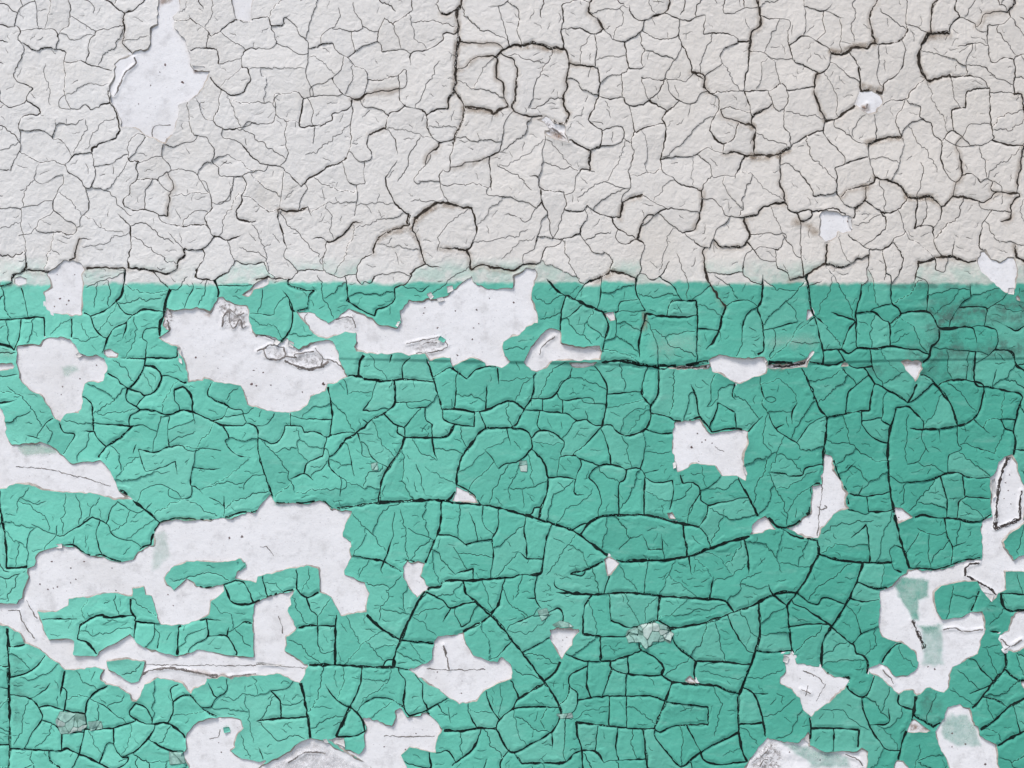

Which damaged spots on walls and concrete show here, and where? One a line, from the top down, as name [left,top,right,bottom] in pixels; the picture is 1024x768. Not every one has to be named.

peeling [158,268,602,413]
crack [0,386,53,443]
peeling [672,419,749,481]
crack [77,595,160,654]
peeling [0,495,370,701]
crack [167,604,252,655]
crack [556,561,603,579]
peeling [868,454,1024,696]
peeling [409,632,513,704]
crack [946,575,1024,768]
crack [802,676,941,760]
peeling [907,704,1000,768]